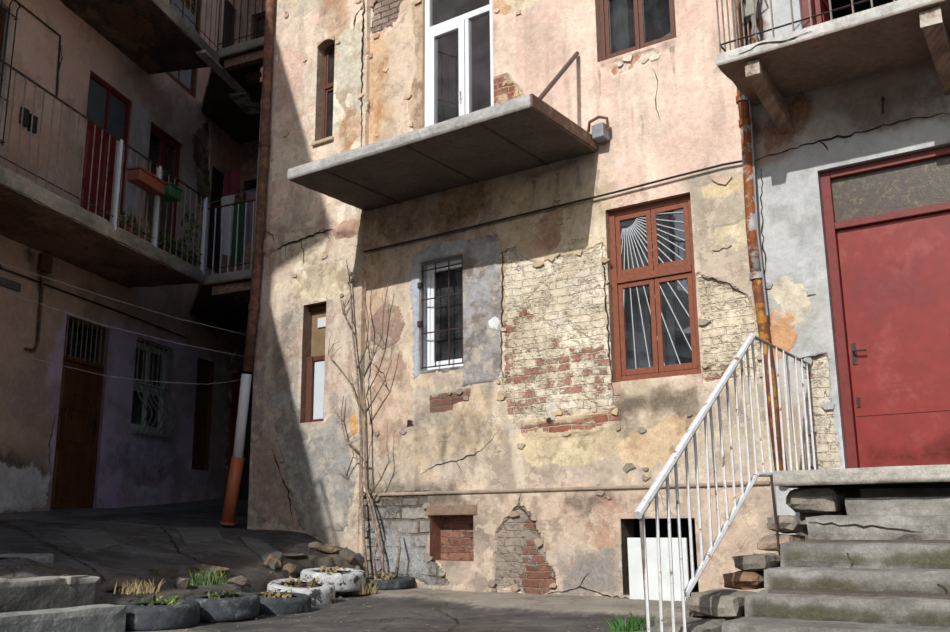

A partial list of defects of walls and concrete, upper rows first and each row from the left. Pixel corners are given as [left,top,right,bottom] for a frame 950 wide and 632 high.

flaking render [275,0,322,18]
flaking render [494,0,537,17]
flaking render [334,0,423,144]
flaking render [494,74,524,105]
flaking render [611,50,660,76]
crack [697,113,950,295]
crack [264,229,332,265]
flaking render [764,276,815,329]
flaking render [496,194,697,481]
crack [423,432,498,473]
flaking render [488,506,557,595]